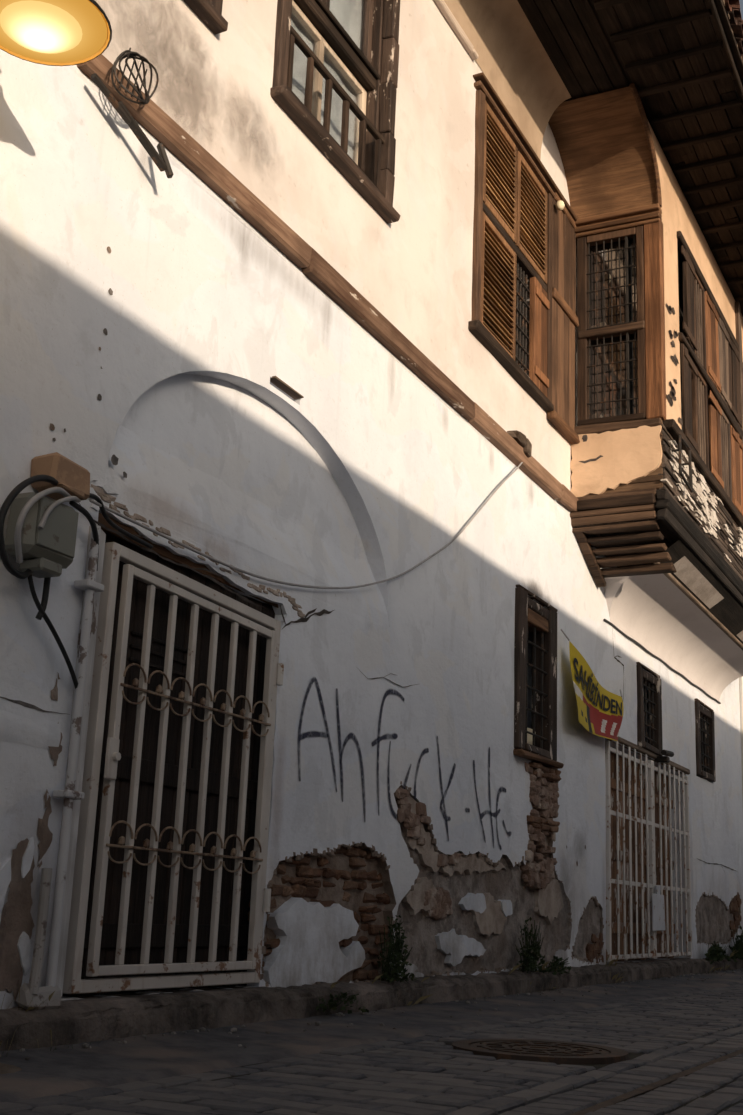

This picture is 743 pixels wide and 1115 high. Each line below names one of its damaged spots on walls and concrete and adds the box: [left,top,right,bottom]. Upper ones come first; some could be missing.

flaking render [89,472,305,618]
flaking render [661,440,743,564]
crack [0,697,66,714]
peeling [48,722,62,766]
peeling [51,672,60,702]
peeling [0,789,53,1001]
spalling [260,761,604,988]
spalling [695,892,742,946]